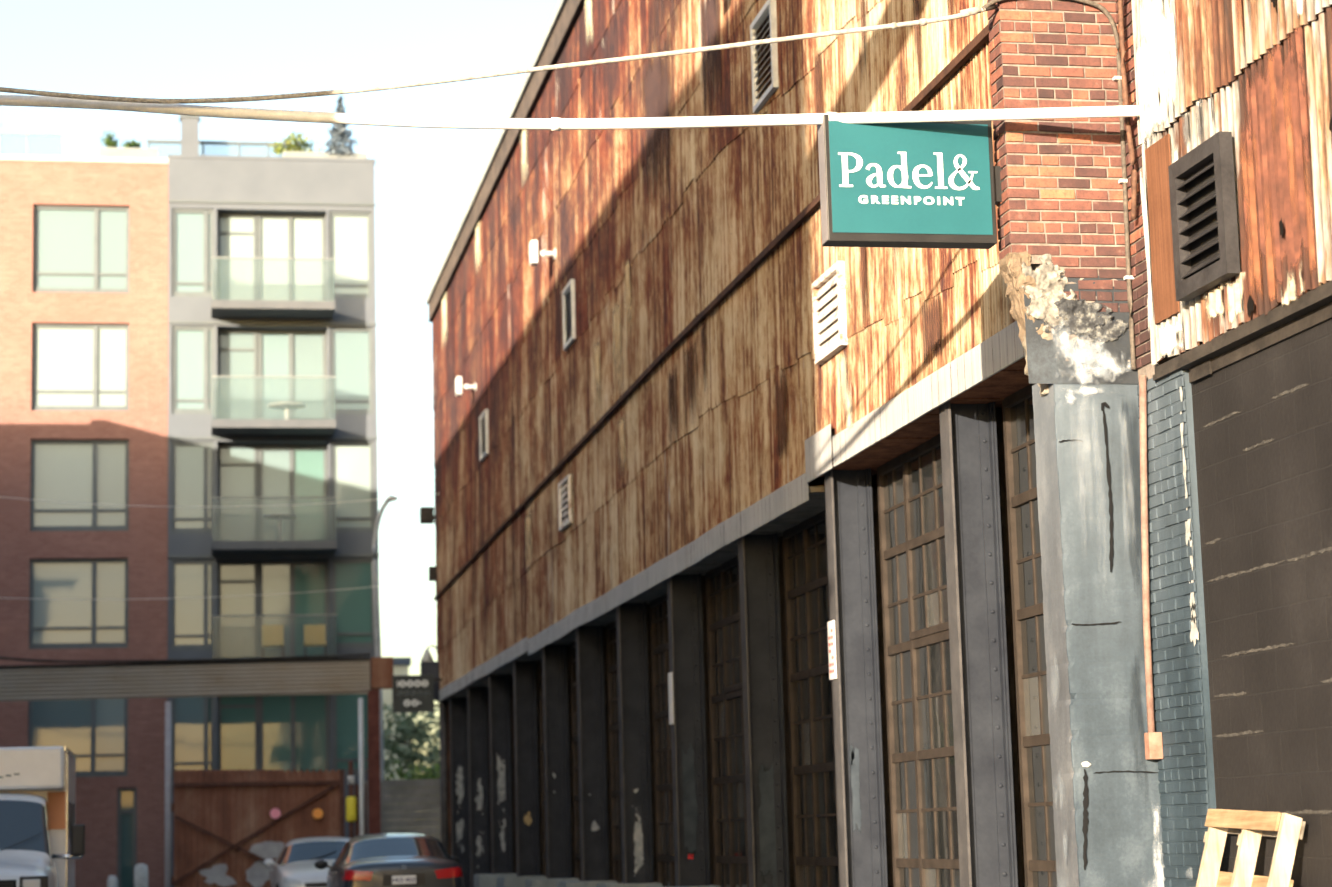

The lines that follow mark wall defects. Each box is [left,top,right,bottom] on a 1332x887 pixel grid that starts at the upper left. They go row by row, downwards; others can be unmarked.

rust [643,0,686,187]
rust [701,0,721,106]
rust [815,52,823,129]
rust [1235,27,1317,300]
rust [859,247,868,318]
spalling [999,251,1128,397]
peeling [1206,273,1243,322]
peeling [1281,270,1303,307]
peeling [1066,386,1097,404]
crack [1059,402,1113,572]
peeling [1180,386,1199,646]
crack [1081,761,1158,870]